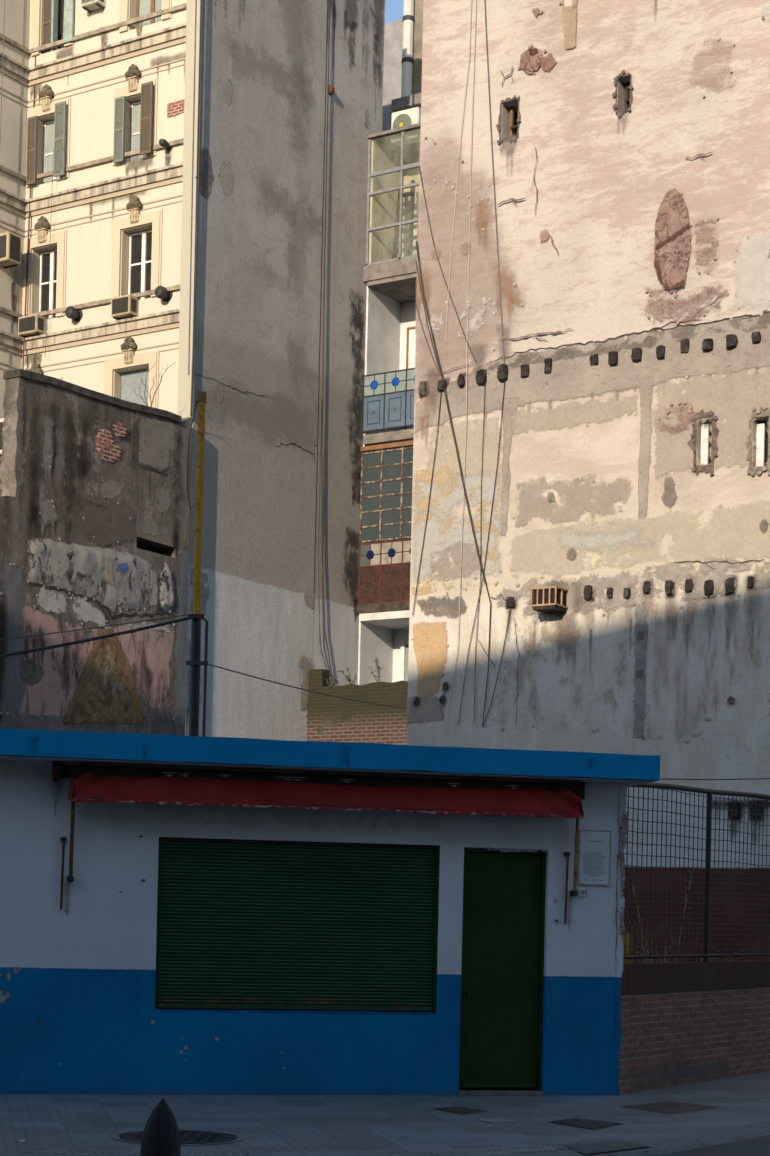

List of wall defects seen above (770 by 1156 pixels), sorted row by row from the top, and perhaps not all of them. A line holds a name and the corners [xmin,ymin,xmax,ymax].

flaking render [517,44,557,74]
crack [195,374,272,398]
damp [349,297,364,504]
damp [0,563,80,728]
damp [129,551,190,726]
peeling [411,616,449,705]